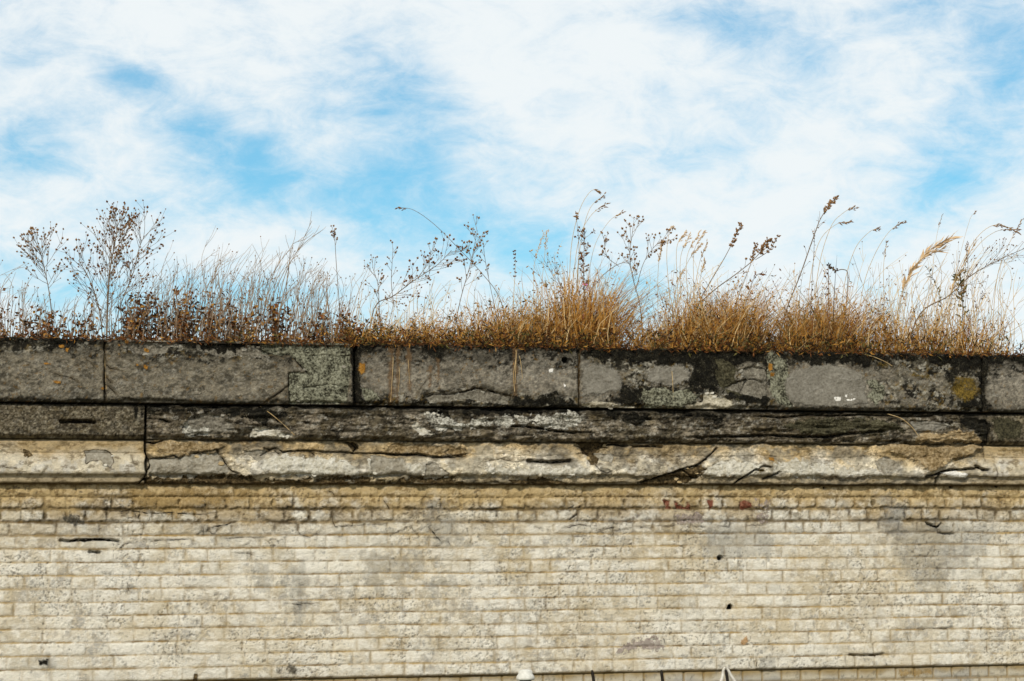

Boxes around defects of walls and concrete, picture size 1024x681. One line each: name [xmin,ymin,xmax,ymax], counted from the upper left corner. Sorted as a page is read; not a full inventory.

damp [779,350,1024,441]
spalling [182,413,235,435]
spalling [910,420,953,433]
peeling [84,449,114,467]
crack [639,414,930,483]
crack [928,445,998,477]
crack [69,408,261,554]